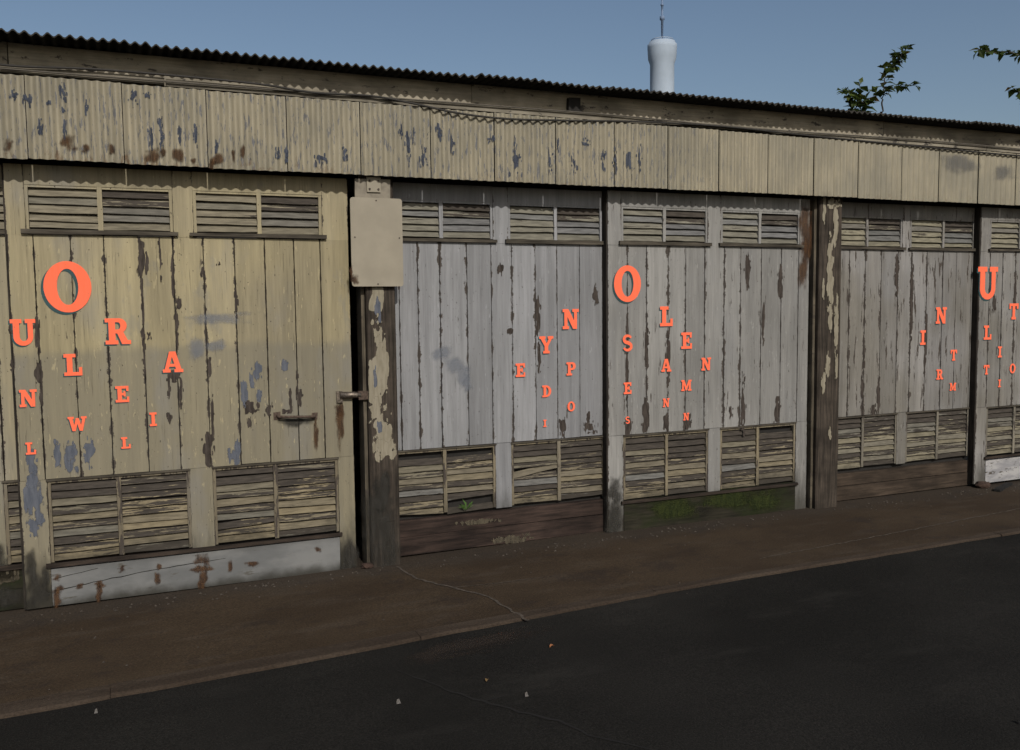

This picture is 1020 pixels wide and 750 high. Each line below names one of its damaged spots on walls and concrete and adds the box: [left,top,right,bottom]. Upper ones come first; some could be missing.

peeling [46,82,68,140]
corrosion [60,137,89,152]
peeling [147,109,165,152]
corrosion [146,148,196,163]
corrosion [209,145,245,169]
peeling [821,196,842,394]
peeling [241,361,273,428]
peeling [368,286,397,462]
peeling [53,436,96,473]
peeling [23,448,45,537]
corrosion [95,581,104,603]
corrosion [191,555,213,589]